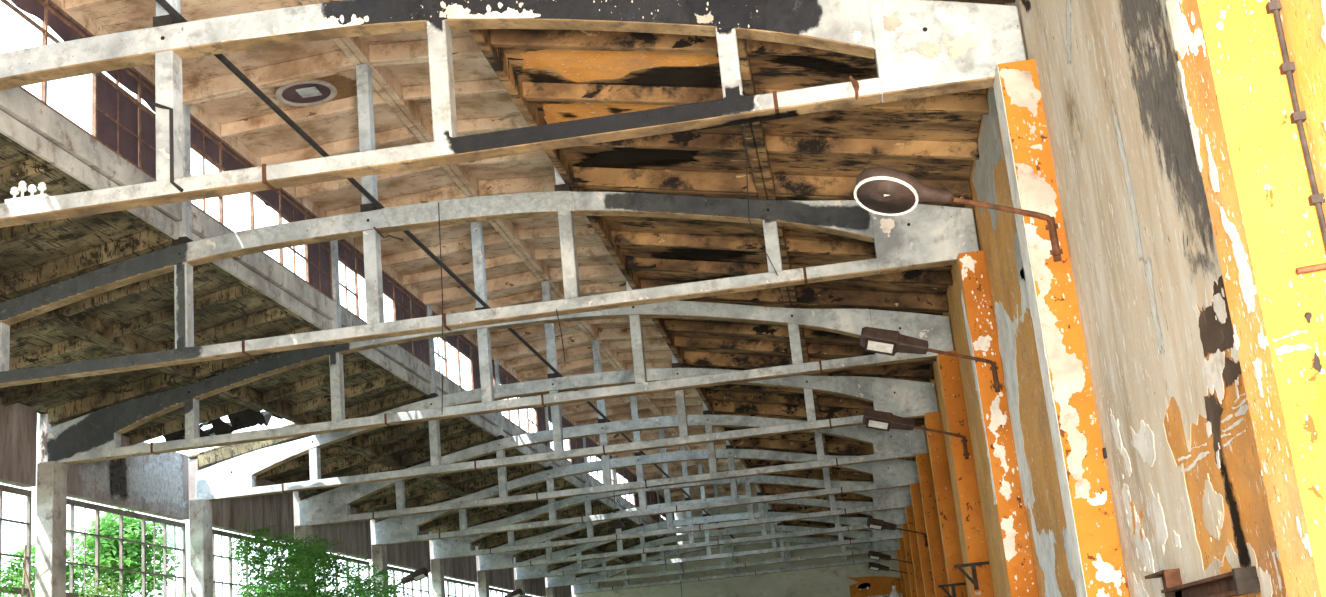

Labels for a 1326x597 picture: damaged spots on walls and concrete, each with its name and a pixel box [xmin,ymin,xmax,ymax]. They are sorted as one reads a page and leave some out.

peeling [439,1,541,19]
peeling [960,0,1273,597]
damp [1112,103,1164,352]
damp [1119,0,1213,272]
peeling [1296,517,1312,556]